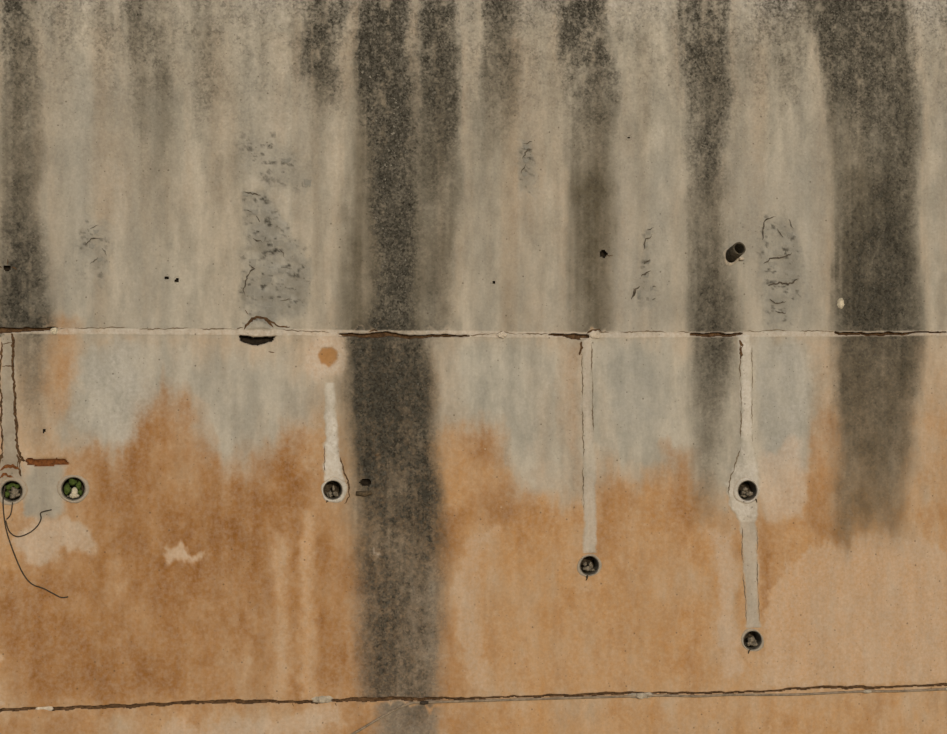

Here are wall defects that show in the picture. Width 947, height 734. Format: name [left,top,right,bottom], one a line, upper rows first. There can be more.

corrosion [40,309,87,427]
water stain [0,0,223,452]
peeling [232,129,316,353]
water stain [236,0,947,734]
peeling [754,209,805,331]
water stain [12,517,57,560]
corrosion [0,363,385,734]
corrosion [432,337,947,734]
crack [0,683,947,713]